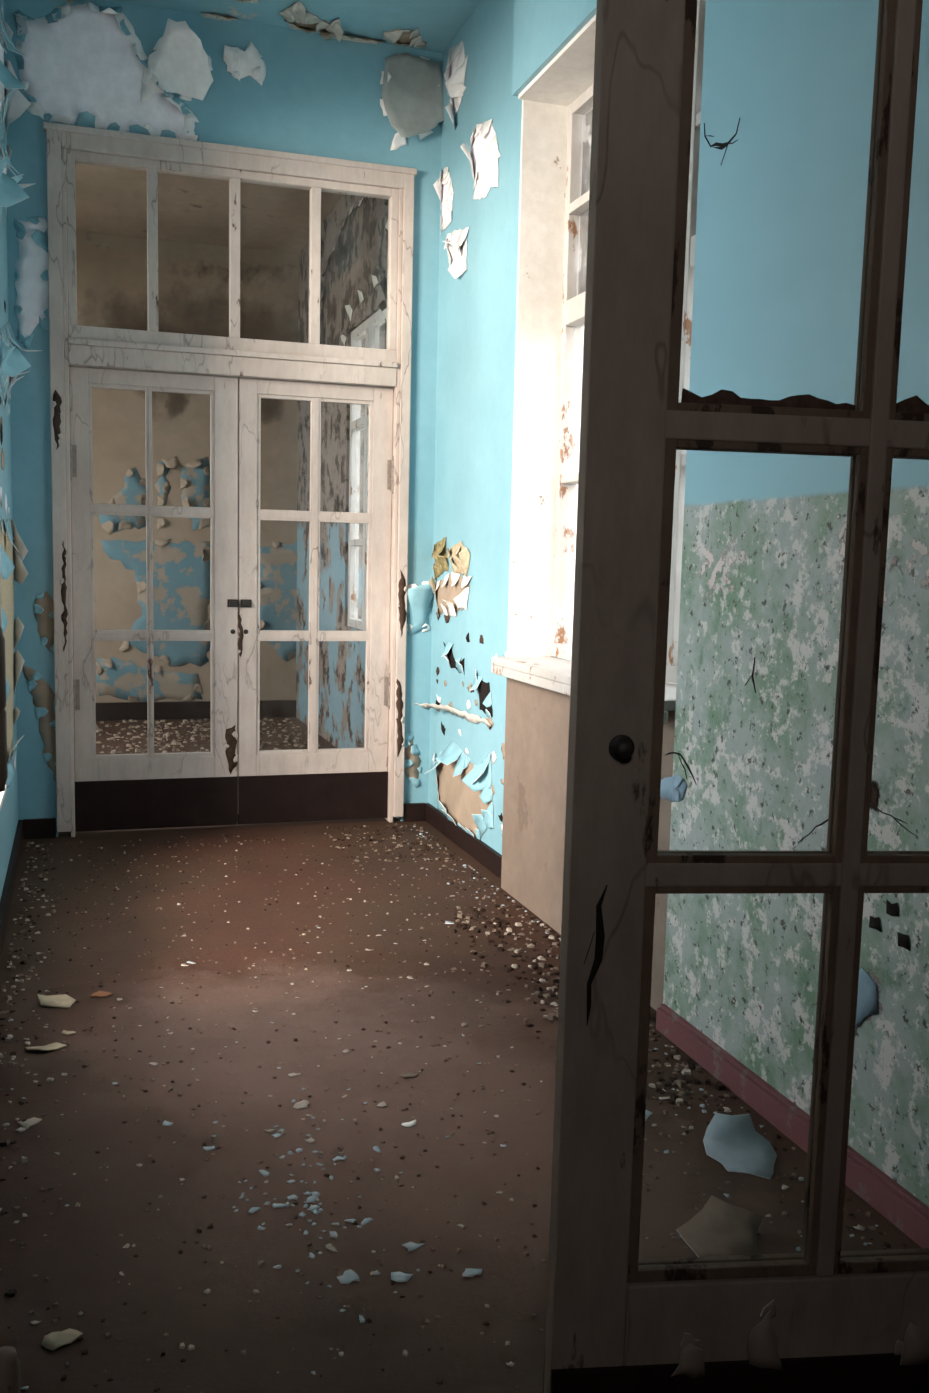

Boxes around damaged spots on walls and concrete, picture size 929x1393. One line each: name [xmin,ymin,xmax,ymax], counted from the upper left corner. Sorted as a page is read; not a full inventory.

peeling [278,1,468,151]
peeling [0,0,266,470]
peeling [433,167,469,279]
peeling [460,118,501,200]
peeling [0,487,68,788]
peeling [397,537,472,636]
peeling [395,633,507,840]
crack [584,885,607,1025]